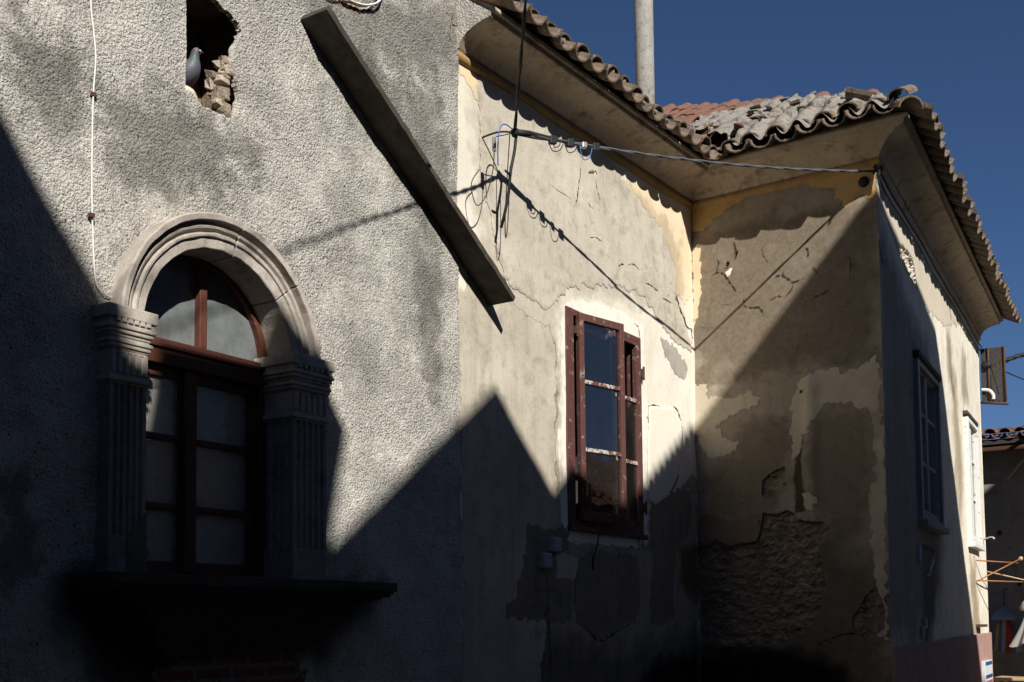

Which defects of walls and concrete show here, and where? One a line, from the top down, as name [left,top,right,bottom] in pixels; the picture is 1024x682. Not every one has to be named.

peeling [458,64,761,682]
crack [619,242,855,344]
flaking render [700,491,829,646]
peeling [762,354,889,641]